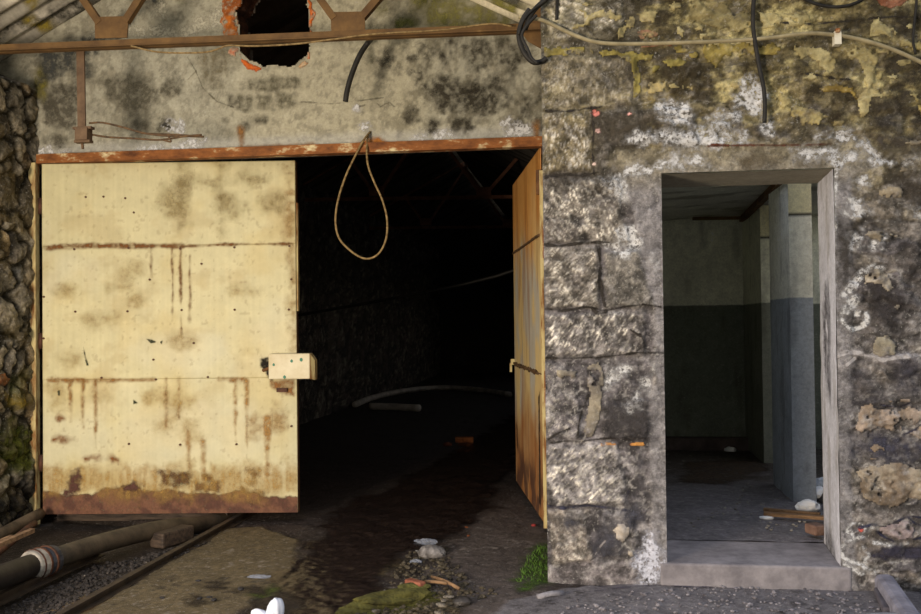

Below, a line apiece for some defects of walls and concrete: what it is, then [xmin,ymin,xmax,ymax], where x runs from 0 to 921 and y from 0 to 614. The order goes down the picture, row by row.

damp [37,33,108,154]
damp [106,74,207,151]
spalling [220,0,259,35]
damp [404,72,542,141]
damp [462,39,523,72]
damp [553,62,775,201]
peeling [544,1,823,98]
peeling [770,93,844,126]
peeling [794,17,921,118]
damp [798,54,921,396]
spalling [856,399,921,439]
spalling [856,444,921,509]